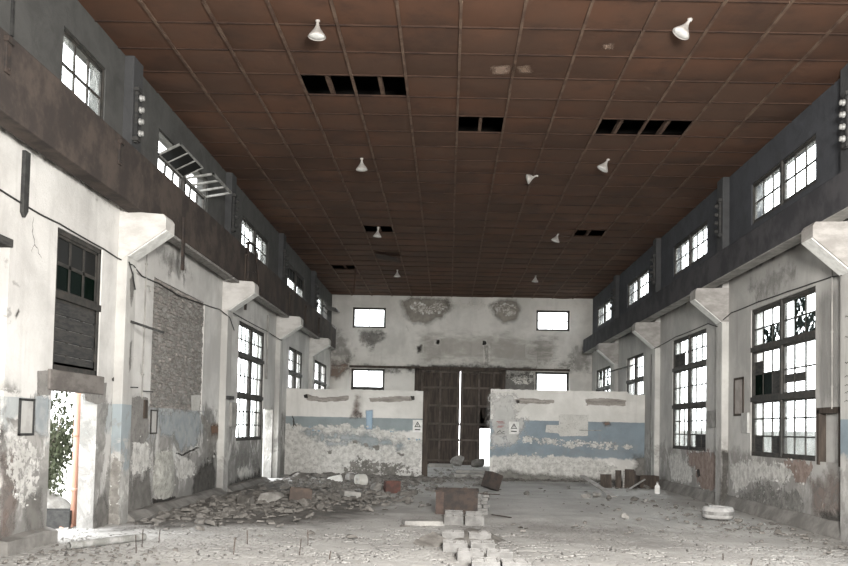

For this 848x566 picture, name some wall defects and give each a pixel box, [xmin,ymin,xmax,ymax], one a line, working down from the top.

peeling [0,425,42,509]
peeling [176,456,196,482]
peeling [284,422,422,476]
peeling [492,436,633,480]
peeling [668,449,716,491]
peeling [729,457,813,513]